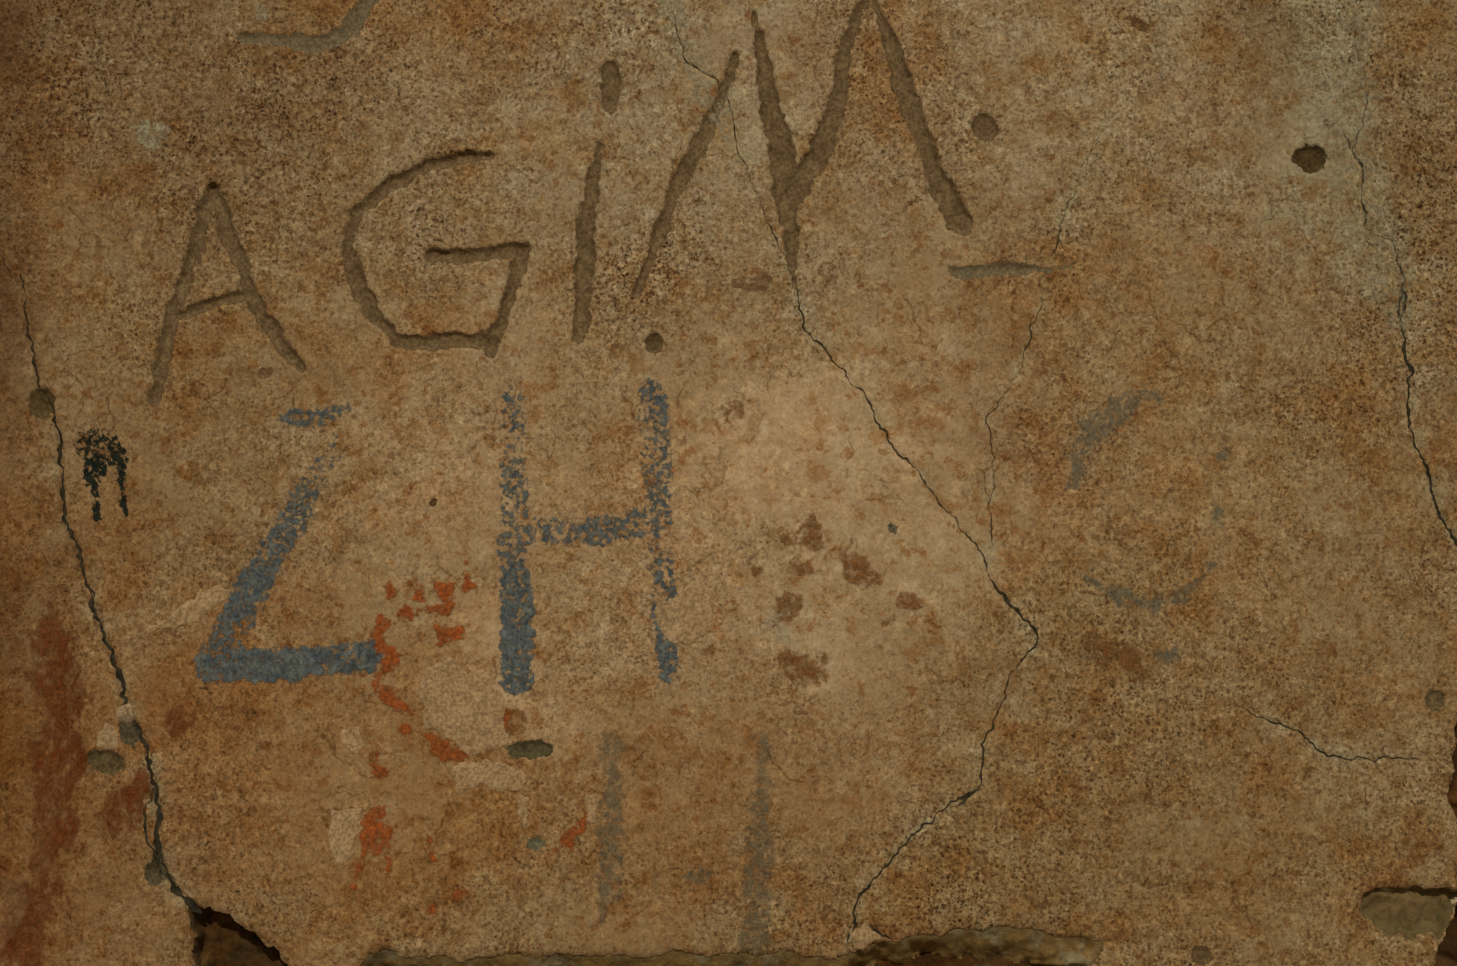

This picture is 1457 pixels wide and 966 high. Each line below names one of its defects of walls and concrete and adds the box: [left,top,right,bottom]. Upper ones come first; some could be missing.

crack [674,17,748,169]
crack [1053,196,1075,253]
crack [1022,301,1043,366]
crack [1343,38,1457,546]
crack [2,257,202,914]
crack [763,210,1038,953]
spalling [1425,688,1445,712]
crack [1234,703,1421,804]
spalling [1447,723,1457,818]
spalling [187,907,288,966]
spalling [360,920,1104,966]
spalling [1360,885,1457,966]